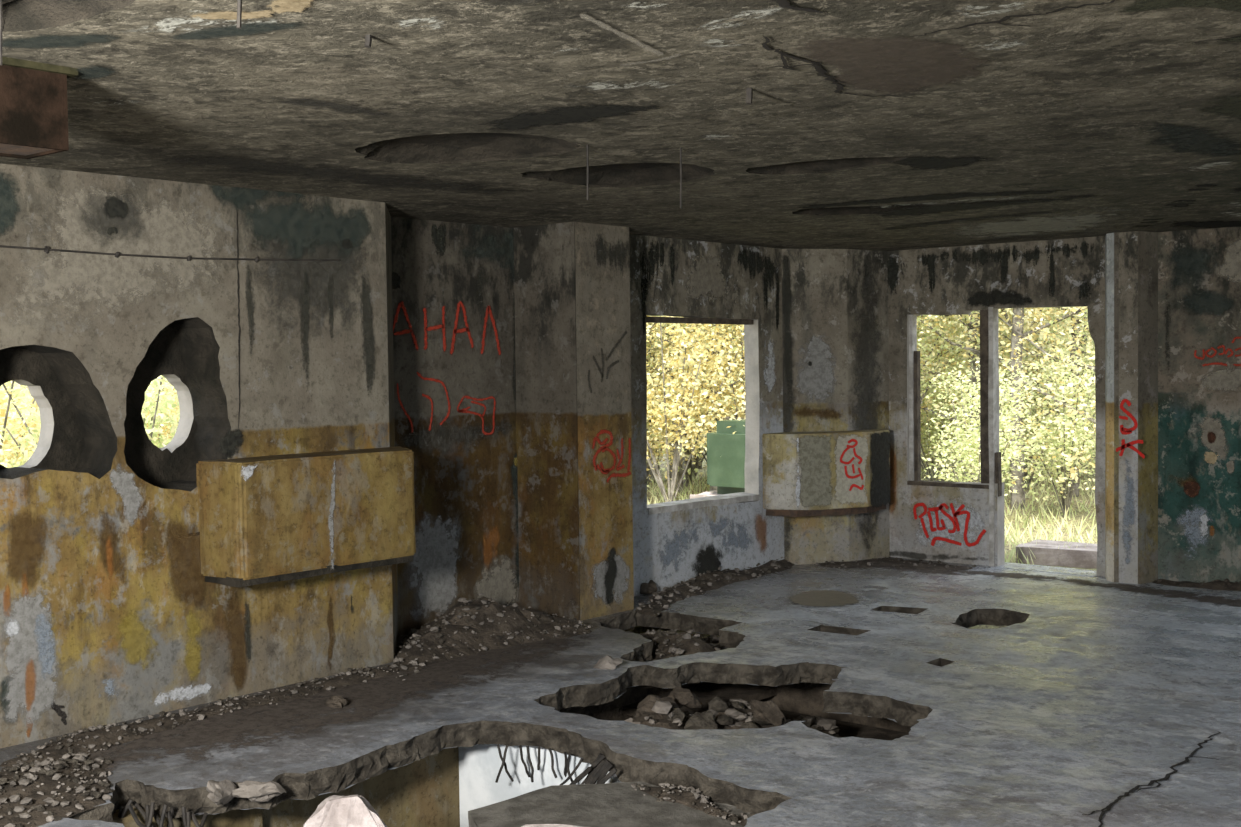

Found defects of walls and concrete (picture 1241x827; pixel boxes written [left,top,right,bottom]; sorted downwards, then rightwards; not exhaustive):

crack [762,36,913,98]
water stain [0,173,20,234]
water stain [243,200,375,395]
water stain [593,237,675,336]
water stain [852,241,1094,430]
peeling [1200,416,1234,473]
peeling [1178,481,1214,557]
peeling [0,591,58,724]
crack [1082,732,1220,827]